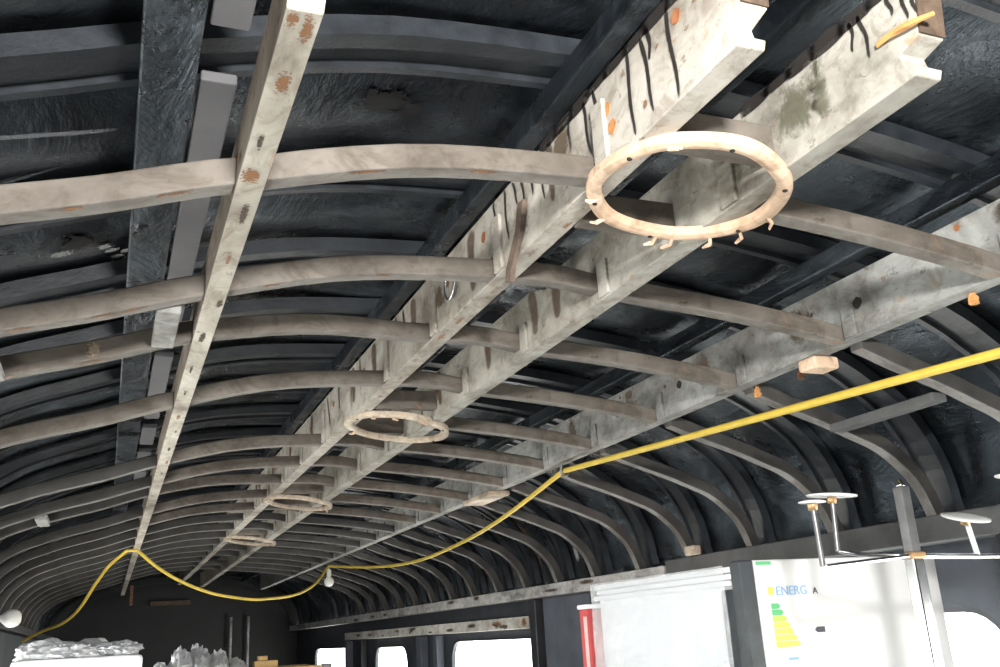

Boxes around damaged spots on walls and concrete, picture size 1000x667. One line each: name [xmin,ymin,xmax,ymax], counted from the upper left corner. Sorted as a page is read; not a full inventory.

rust [287,13,316,44]
water stain [740,0,917,134]
rust [274,71,292,95]
rust [237,153,262,184]